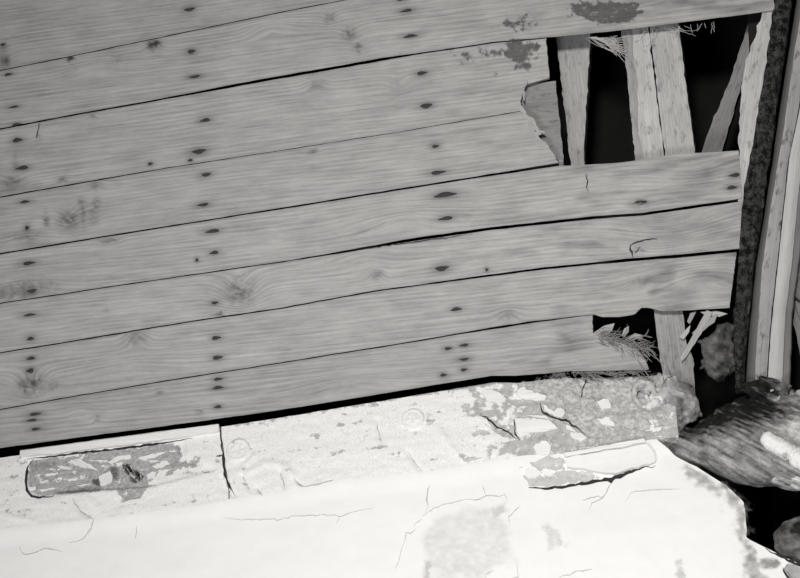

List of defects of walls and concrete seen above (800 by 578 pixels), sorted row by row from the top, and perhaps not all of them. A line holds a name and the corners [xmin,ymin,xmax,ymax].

peeling [472,372,668,487]
crack [396,486,519,567]
crack [529,466,673,508]